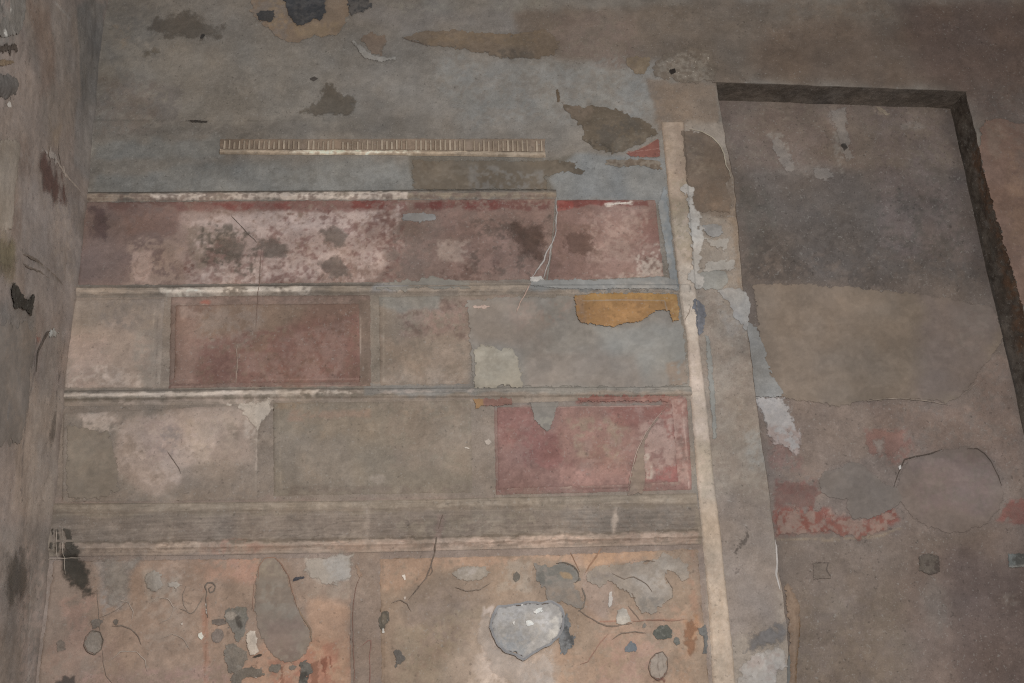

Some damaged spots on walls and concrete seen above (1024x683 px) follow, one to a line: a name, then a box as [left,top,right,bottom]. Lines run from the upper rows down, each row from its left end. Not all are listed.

flaking render [249,0,349,43]
flaking render [404,29,560,59]
flaking render [556,89,662,170]
flaking render [681,128,732,214]
flaking render [692,298,707,335]
crack [894,449,942,486]
leakage [50,528,80,556]
crack [409,515,443,599]
spalling [198,582,313,683]
flaking render [489,552,690,661]